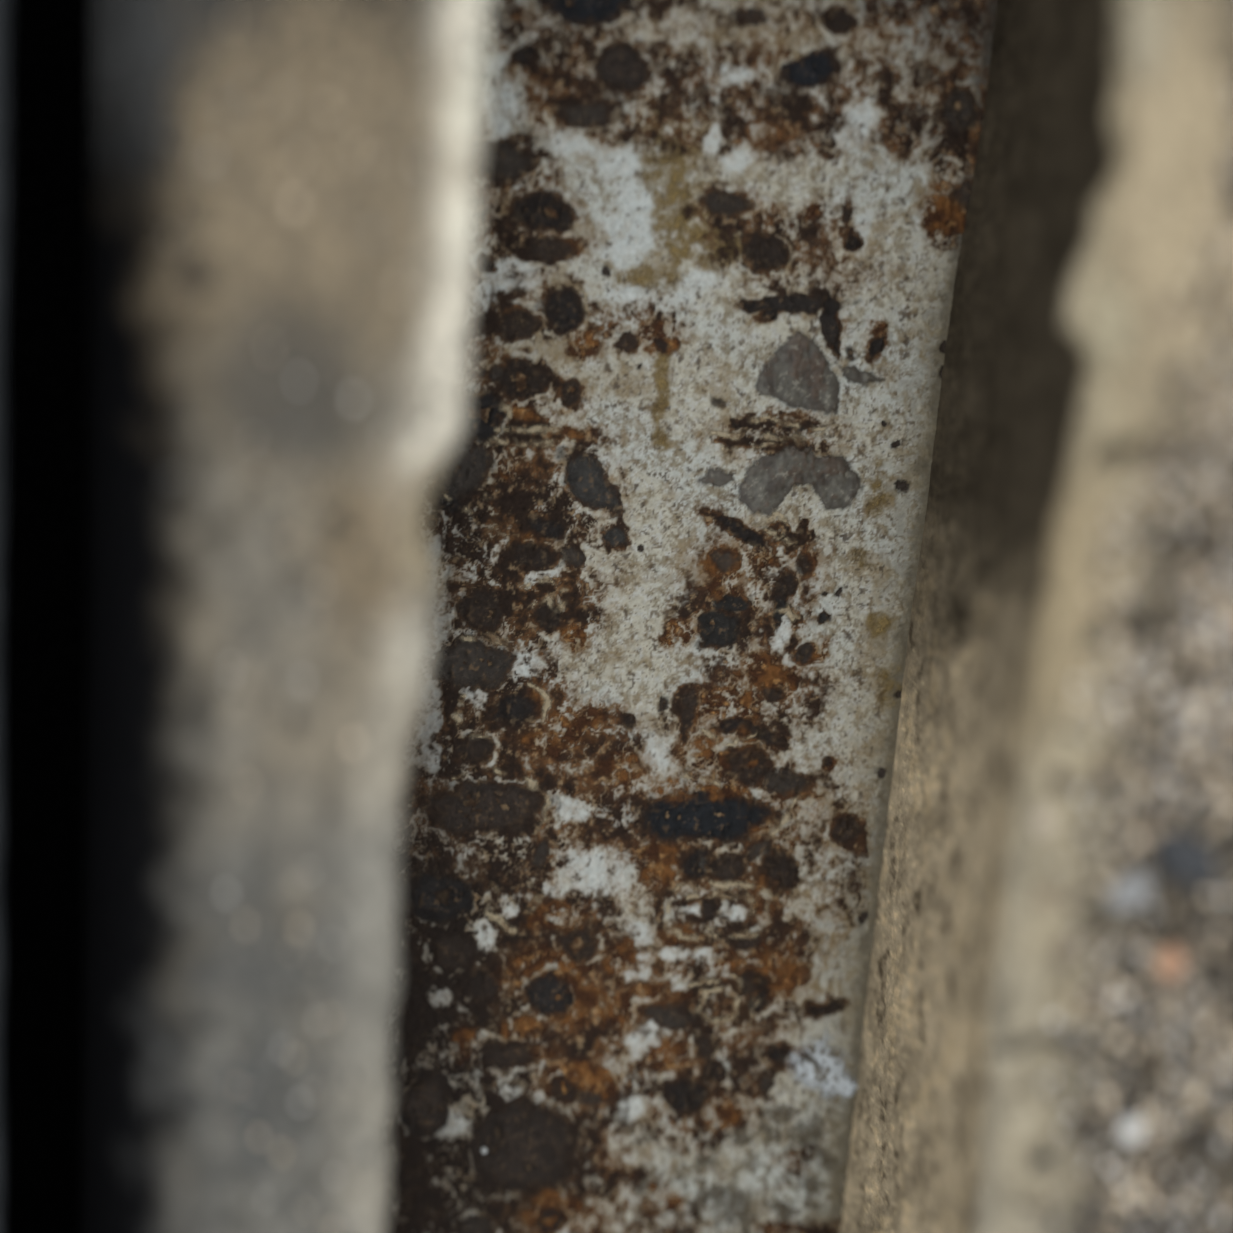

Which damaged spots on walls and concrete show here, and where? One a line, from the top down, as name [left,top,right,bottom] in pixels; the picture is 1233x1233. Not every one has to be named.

corrosion [385,0,995,1233]